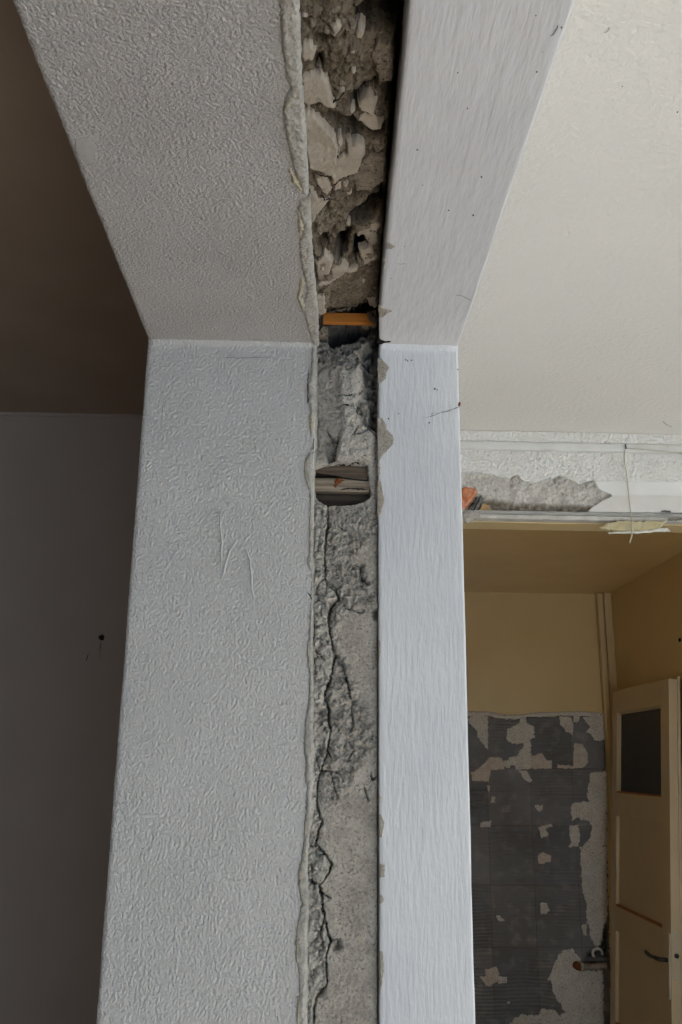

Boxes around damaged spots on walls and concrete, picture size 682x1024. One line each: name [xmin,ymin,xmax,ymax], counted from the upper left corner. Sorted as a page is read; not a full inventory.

spalling [279,0,405,1024]
flaking render [461,472,610,524]
crack [308,515,360,990]
flaking render [467,711,609,947]
flaking render [480,966,507,987]
flaking render [509,948,605,1024]